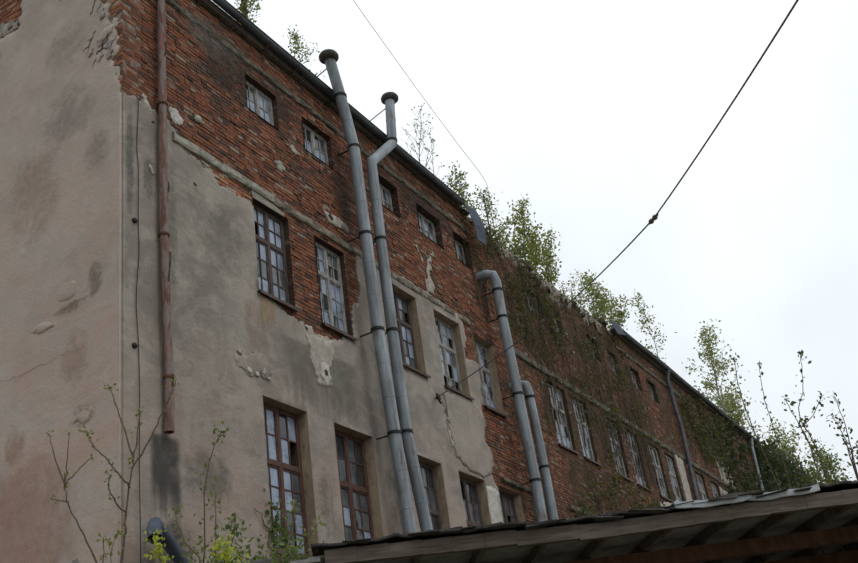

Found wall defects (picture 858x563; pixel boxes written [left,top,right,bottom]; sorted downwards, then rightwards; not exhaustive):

spalling [0,0,22,39]
crack [83,34,112,67]
spalling [262,210,359,387]
water stain [153,434,179,502]